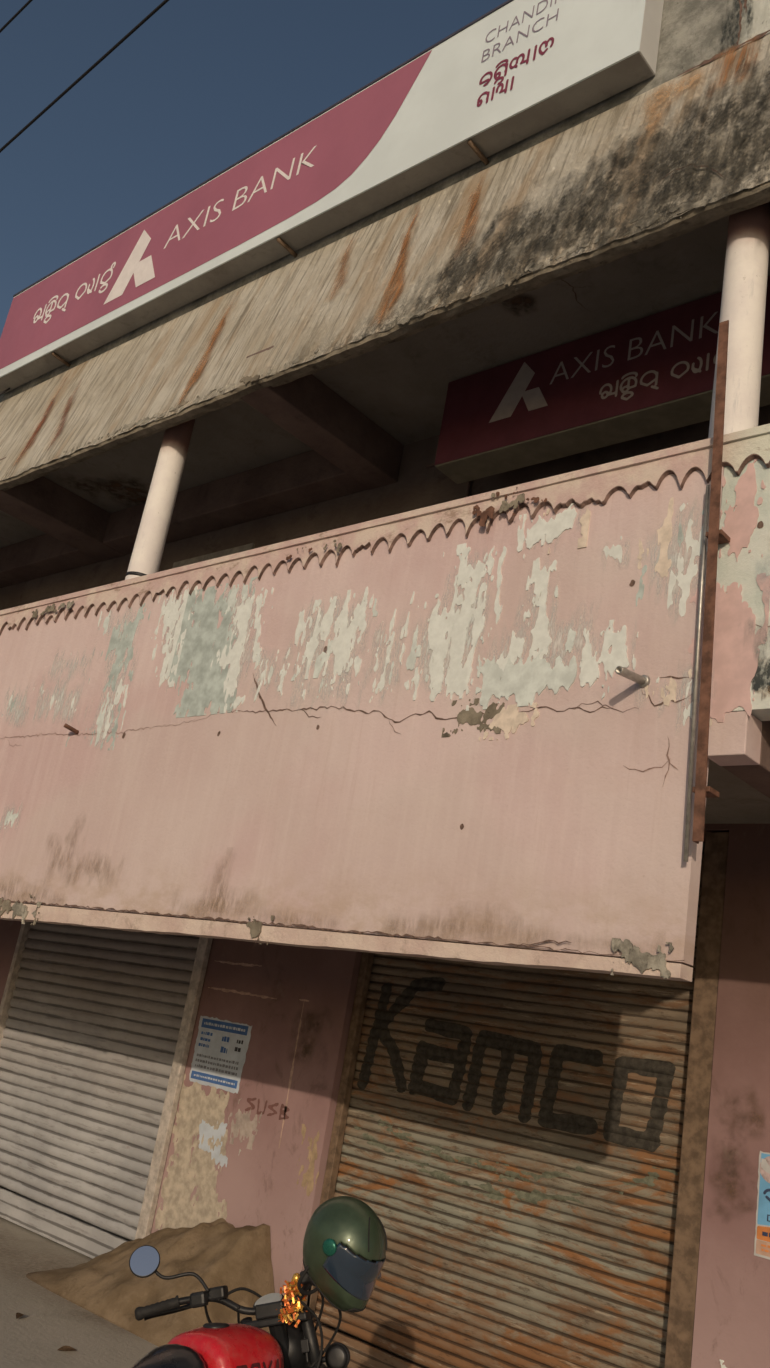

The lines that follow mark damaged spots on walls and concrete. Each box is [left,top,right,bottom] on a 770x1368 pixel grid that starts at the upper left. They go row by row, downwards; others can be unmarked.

damp [417,64,770,313]
corrosion [379,207,418,319]
corrosion [179,308,229,404]
corrosion [17,397,71,461]
damp [0,454,770,636]
peeling [32,459,770,750]
crack [1,675,484,747]
crack [521,676,694,784]
damp [751,637,770,692]
spalling [610,938,674,979]